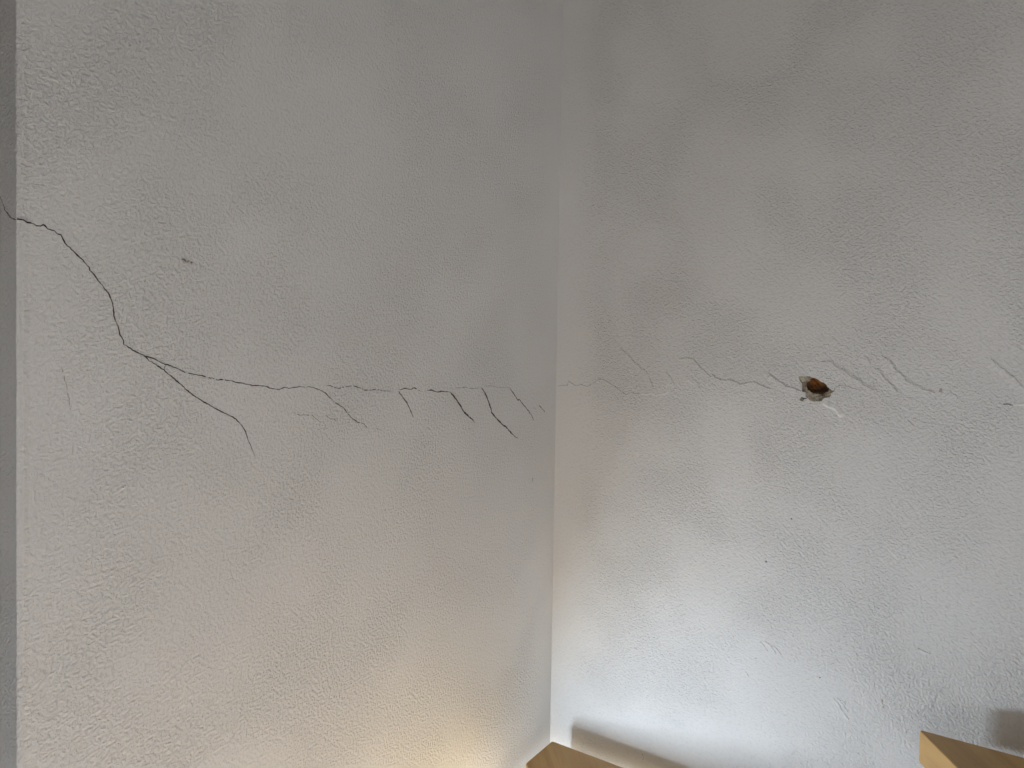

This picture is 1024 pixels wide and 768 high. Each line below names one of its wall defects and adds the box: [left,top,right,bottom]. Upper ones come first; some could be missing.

crack [0,198,545,456]
spalling [799,376,835,401]